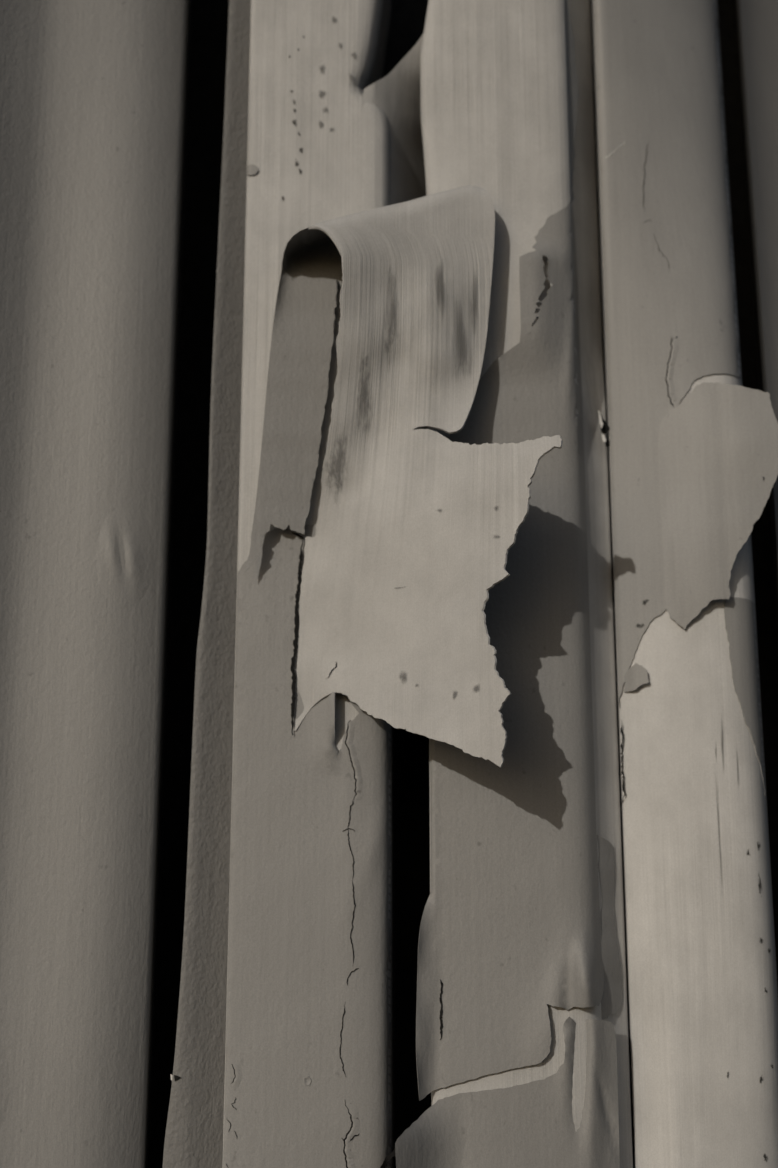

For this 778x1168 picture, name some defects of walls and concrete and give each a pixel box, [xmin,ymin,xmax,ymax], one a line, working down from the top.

peeling [246,0,623,1168]
peeling [659,382,778,798]
crack [339,720,396,1168]